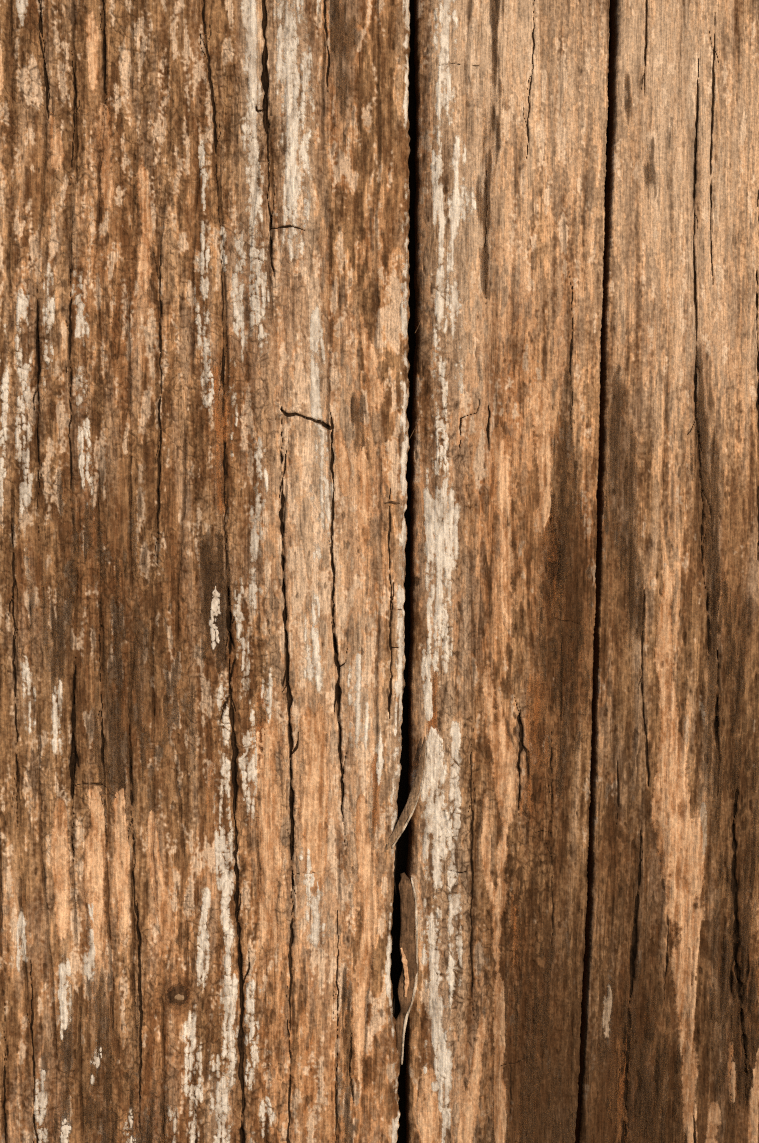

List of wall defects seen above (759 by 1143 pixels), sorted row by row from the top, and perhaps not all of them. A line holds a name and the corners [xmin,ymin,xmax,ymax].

crack [751,271,759,433]
crack [687,13,751,1102]
crack [751,486,759,560]
crack [279,406,348,1143]
crack [333,910,354,1143]